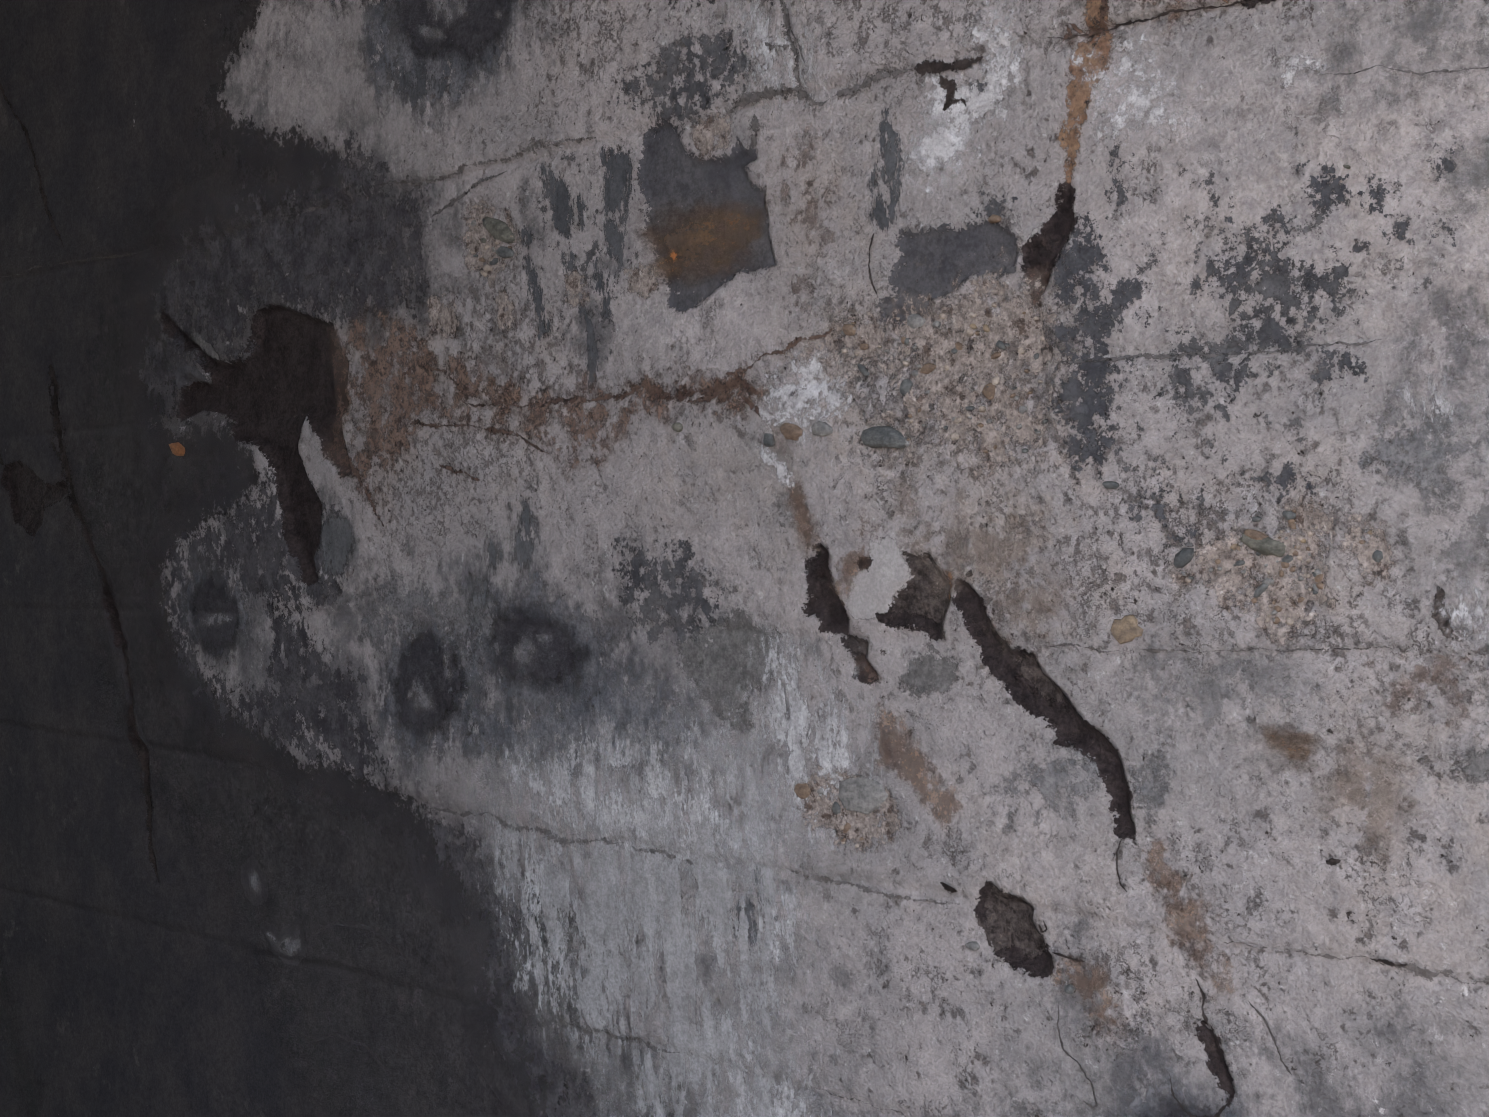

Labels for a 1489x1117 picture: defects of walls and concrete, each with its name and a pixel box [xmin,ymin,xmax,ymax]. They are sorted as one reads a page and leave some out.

leakage [330,0,518,126]
rust [1055,0,1124,184]
crack [1048,0,1261,42]
spalling [160,304,353,586]
rust [335,303,770,522]
leakage [518,139,643,391]
spalling [785,180,1078,483]
leakage [178,500,882,1117]
crack [787,868,959,905]
spalling [875,550,1135,892]
spalling [973,880,1054,979]
crack [1224,941,1489,984]